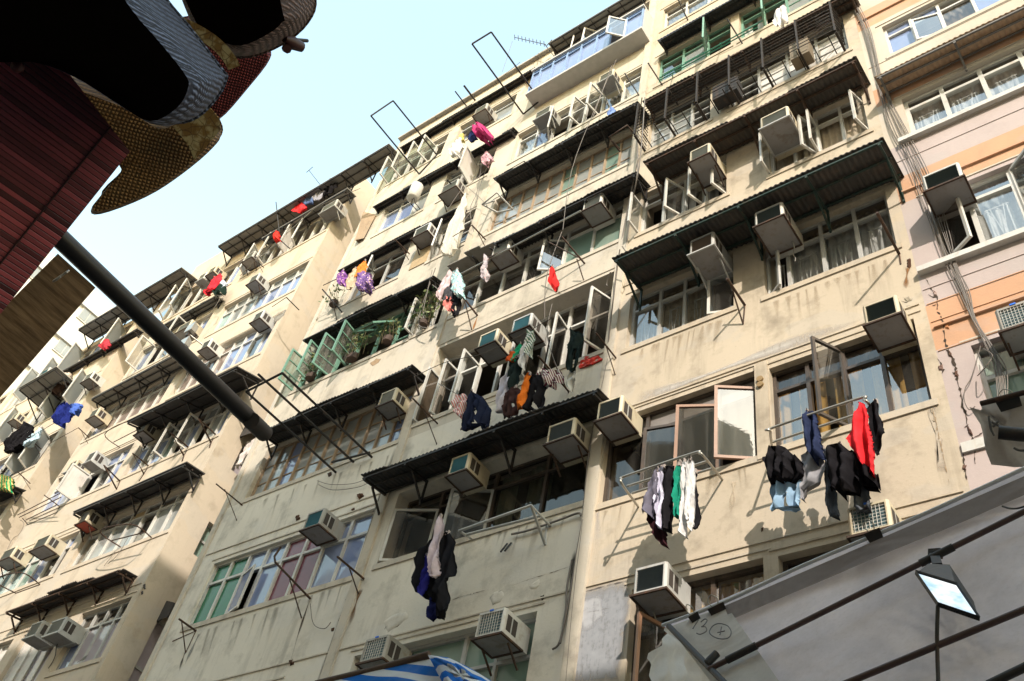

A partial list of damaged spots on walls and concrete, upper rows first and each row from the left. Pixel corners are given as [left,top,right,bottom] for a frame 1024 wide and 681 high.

crack [925,278,983,484]